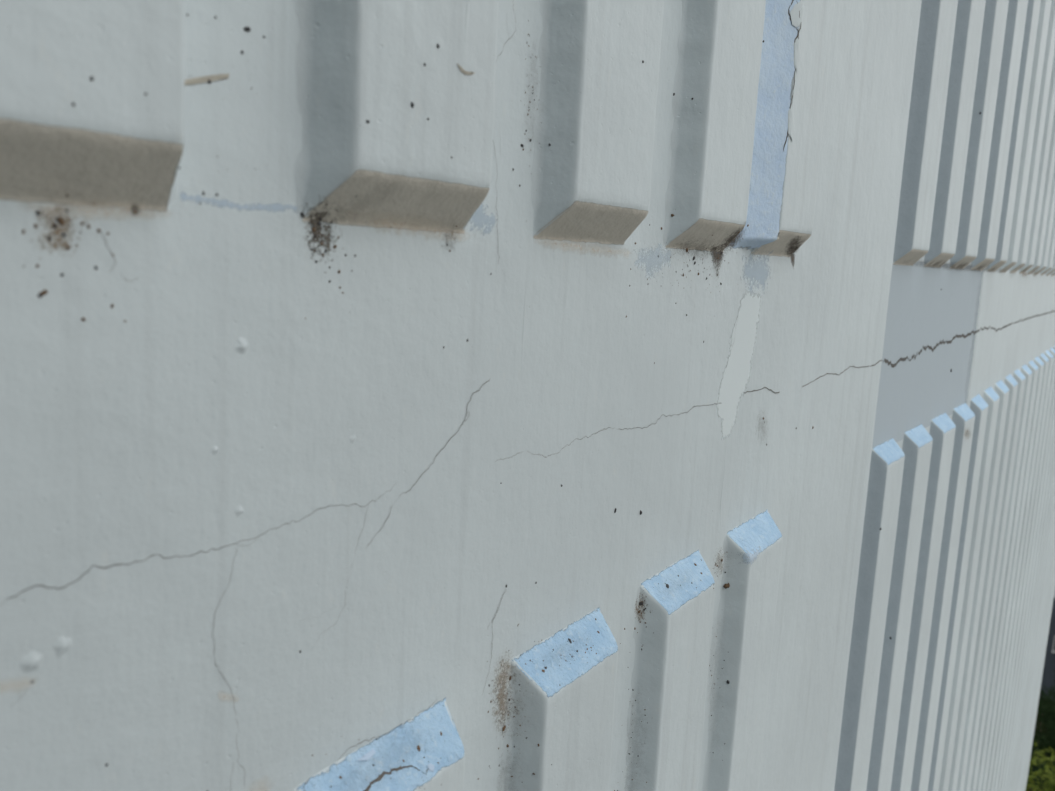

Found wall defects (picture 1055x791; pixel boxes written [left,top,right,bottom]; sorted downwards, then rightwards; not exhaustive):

peeling [783,0,805,150]
crack [746,310,1055,394]
crack [10,381,488,786]
crack [363,765,428,791]